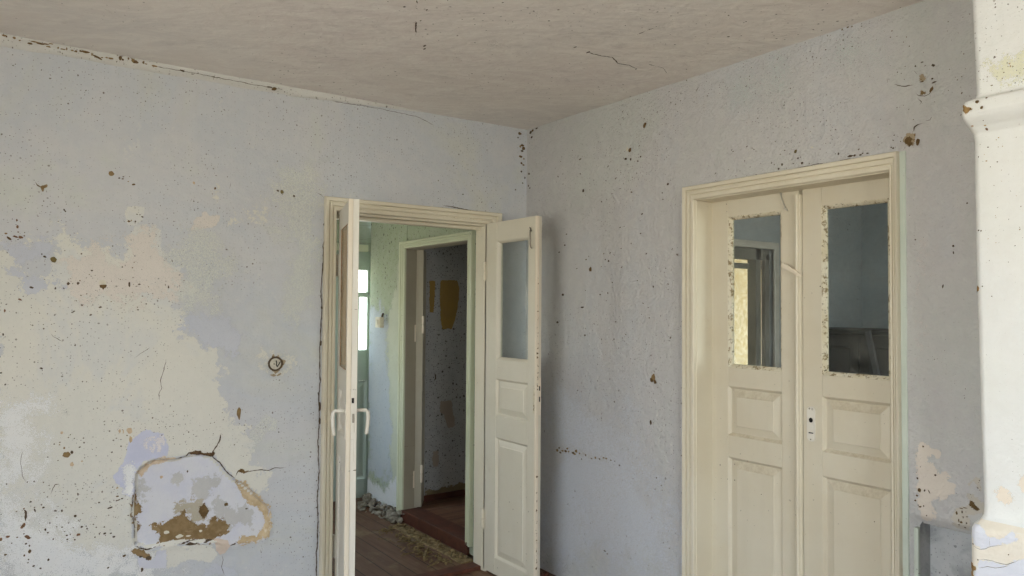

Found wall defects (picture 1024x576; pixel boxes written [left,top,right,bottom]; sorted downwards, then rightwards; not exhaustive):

peeling [429,280,459,329]
peeling [0,206,277,576]
peeling [914,442,1024,576]